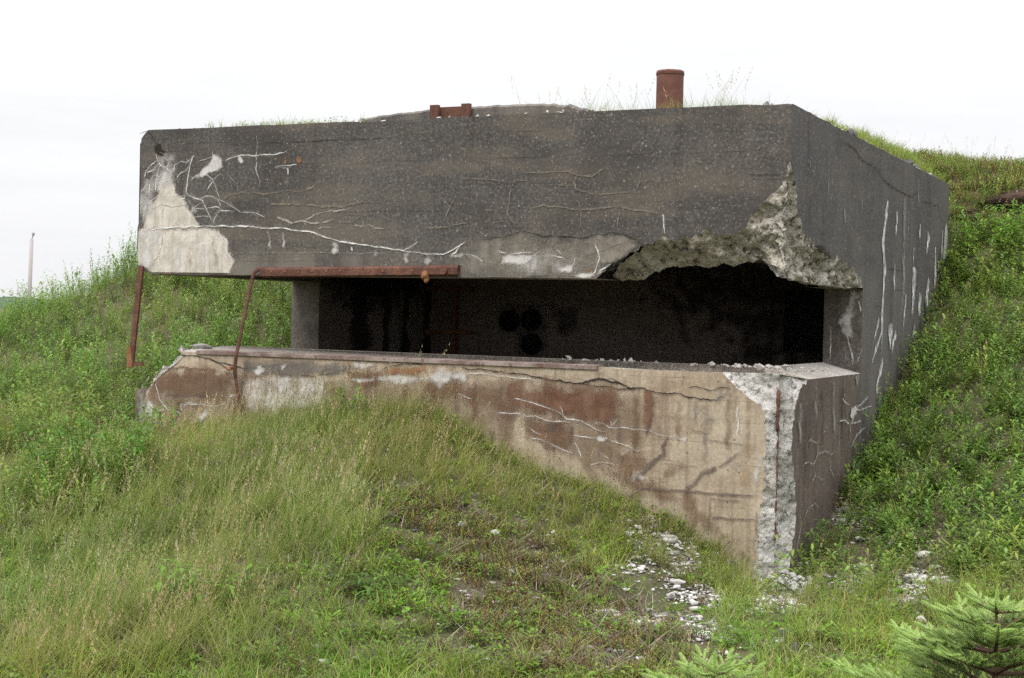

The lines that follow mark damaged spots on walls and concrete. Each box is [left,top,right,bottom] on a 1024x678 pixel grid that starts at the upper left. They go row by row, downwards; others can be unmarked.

peeling [141,159,199,231]
crack [140,131,665,278]
spalling [469,162,862,290]
rust [402,378,653,452]
crack [459,367,730,465]
spalling [723,372,807,582]
crack [797,393,871,548]